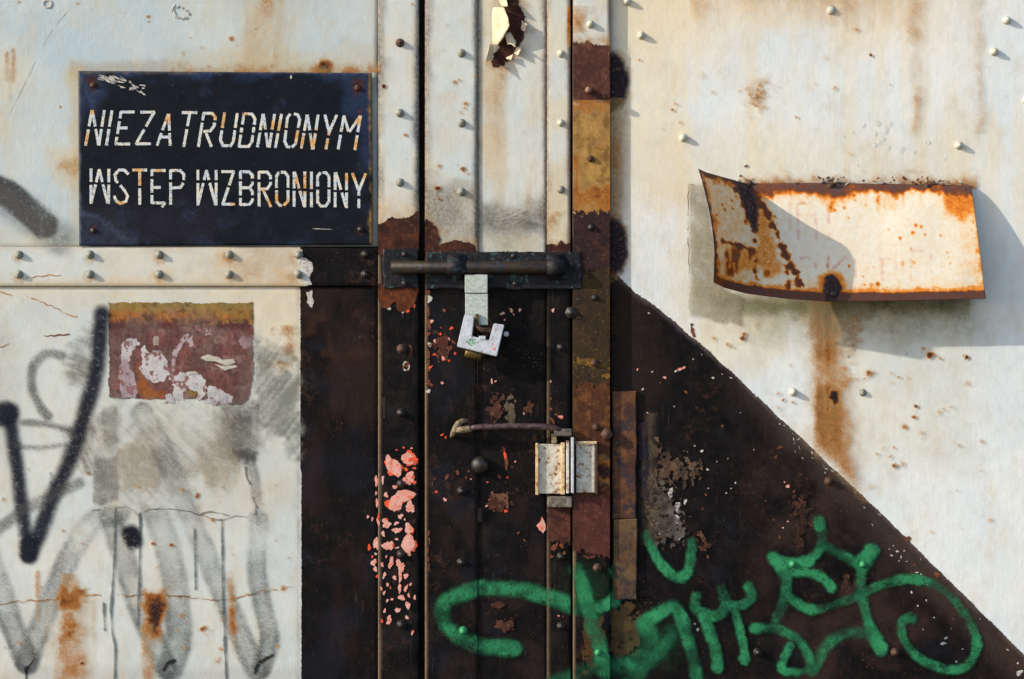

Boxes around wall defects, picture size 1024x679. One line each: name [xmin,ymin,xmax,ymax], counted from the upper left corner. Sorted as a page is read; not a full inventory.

peeling [485,0,527,68]
corrosion [378,211,477,261]
corrosion [547,6,629,560]
corrosion [741,176,977,189]
peeling [108,302,254,406]
corrosion [809,301,864,479]
peeling [367,447,418,635]
peeling [639,437,717,555]
corrosion [0,570,100,679]
corrosion [118,584,292,679]